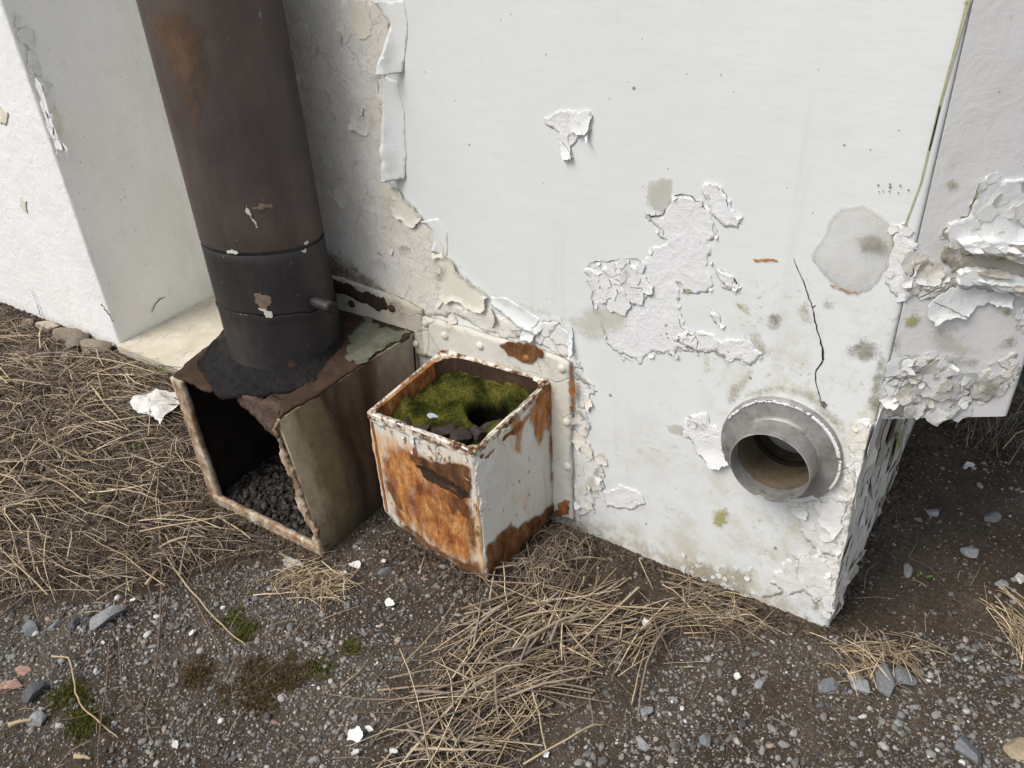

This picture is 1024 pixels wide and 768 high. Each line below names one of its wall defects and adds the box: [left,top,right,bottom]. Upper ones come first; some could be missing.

peeling [14,13,68,152]
peeling [283,0,645,517]
rust [500,341,543,364]
damp [648,178,670,211]
peeling [584,182,763,365]
crack [794,260,824,401]
peeling [885,172,1024,333]
peeling [681,412,729,470]
peeling [770,351,1021,620]
peeling [680,552,756,598]